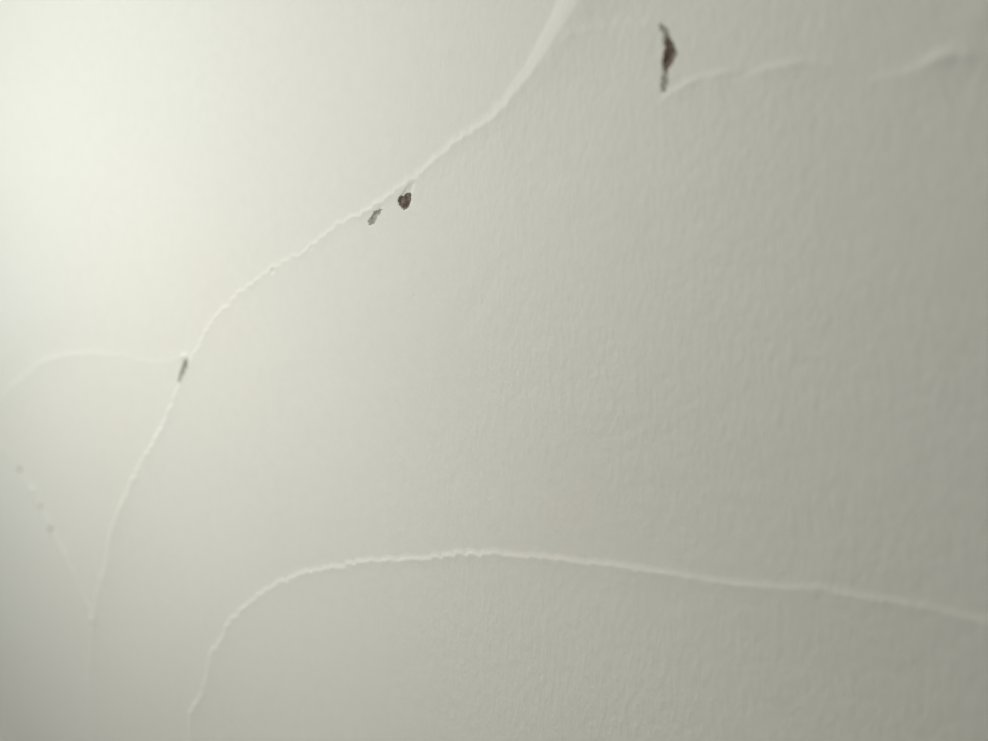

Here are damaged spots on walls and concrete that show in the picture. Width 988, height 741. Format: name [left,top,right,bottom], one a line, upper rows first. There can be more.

crack [86,0,663,741]
crack [651,12,988,106]